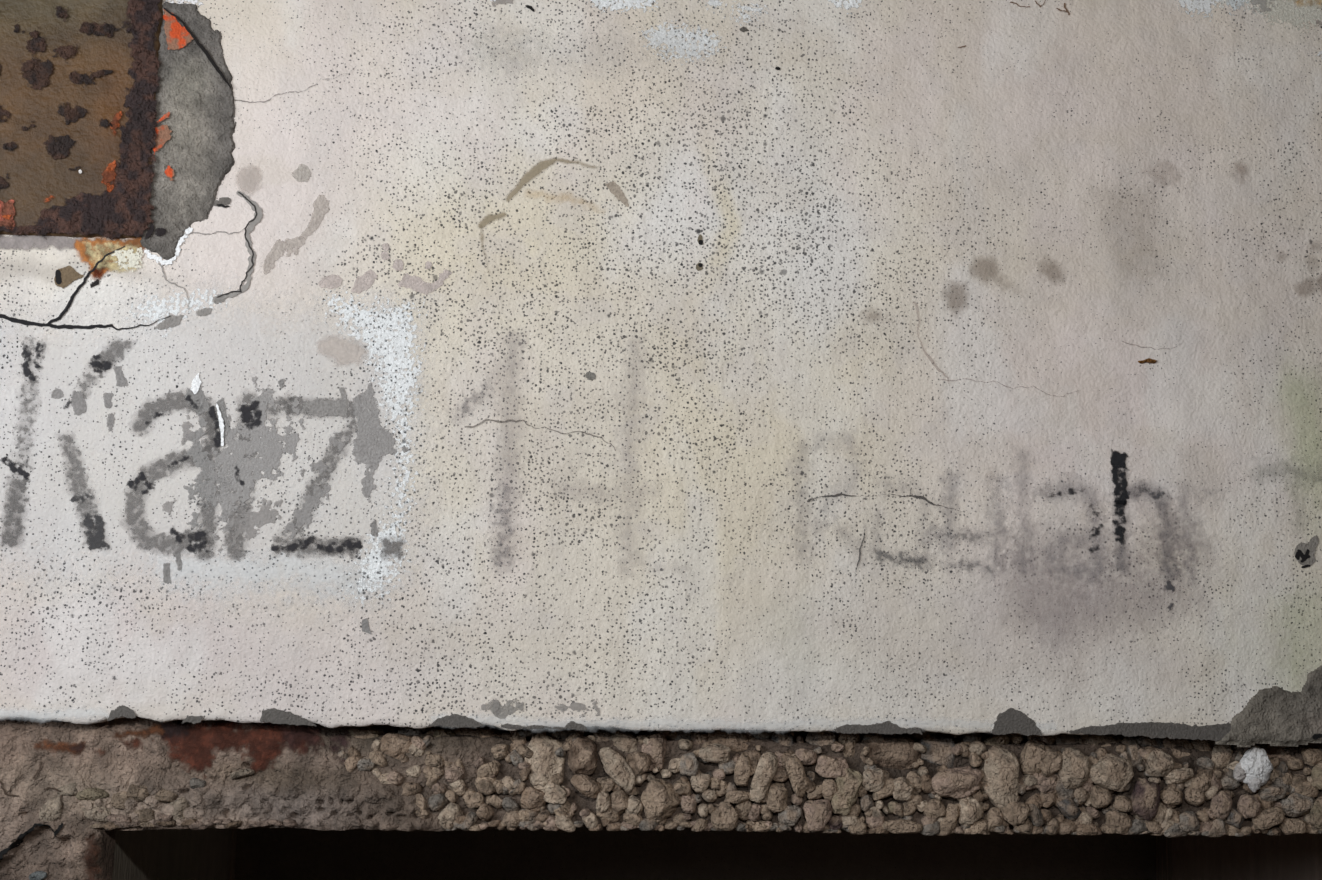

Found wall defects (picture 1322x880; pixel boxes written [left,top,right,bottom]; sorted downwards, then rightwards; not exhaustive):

peeling [490,0,535,12]
peeling [637,0,769,65]
corrosion [0,0,161,278]
flaking render [140,0,237,265]
crack [0,191,263,330]
corrosion [35,740,104,754]
flaking render [107,705,136,721]
corrosion [115,720,349,771]
flaking render [260,708,316,726]
spalling [338,665,1322,838]
crack [0,762,63,862]
spalling [39,778,297,830]